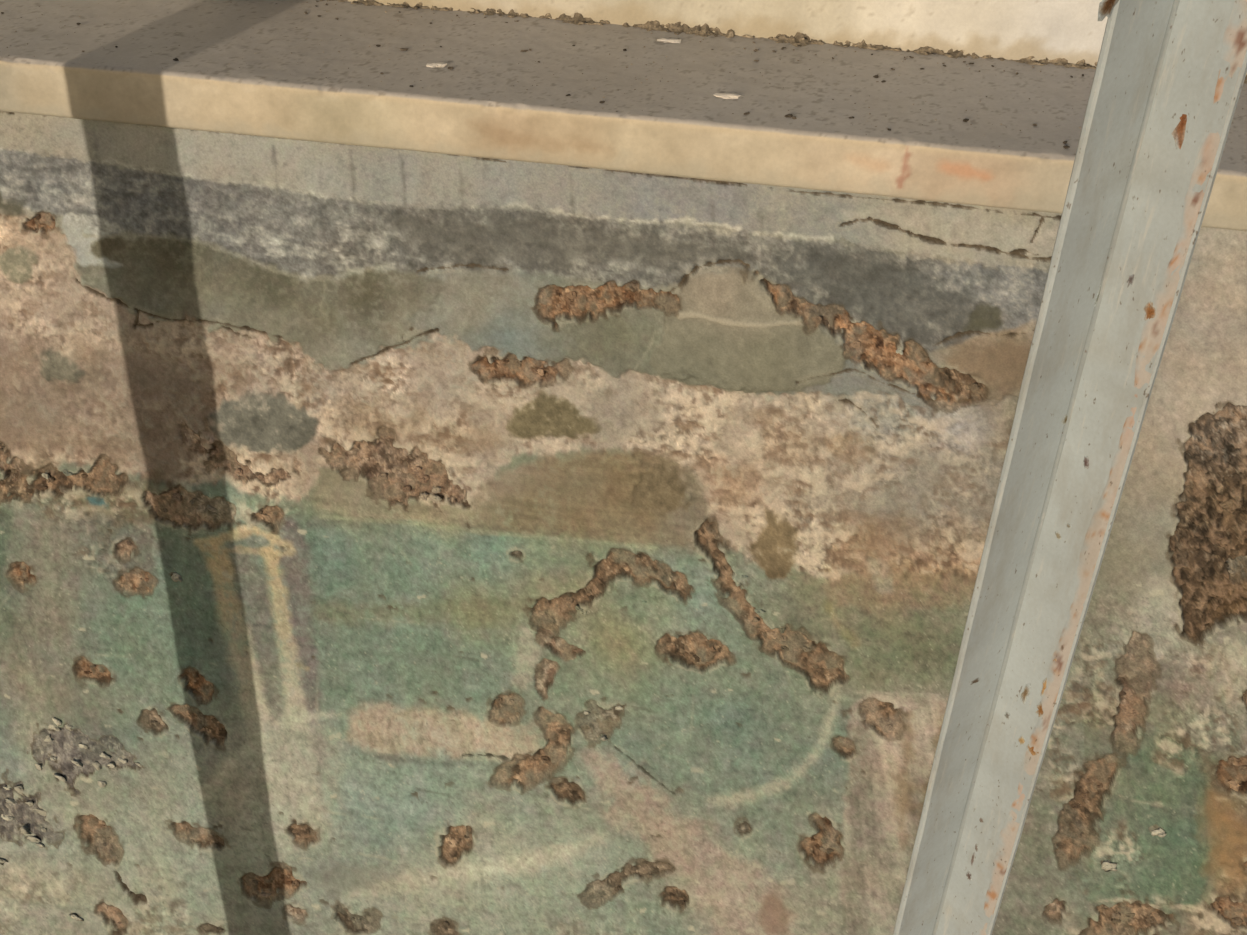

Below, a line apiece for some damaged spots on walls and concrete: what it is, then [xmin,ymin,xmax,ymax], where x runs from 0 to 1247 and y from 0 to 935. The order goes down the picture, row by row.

crack [447,154,507,163]
crack [568,166,1062,263]
spalling [0,206,1019,699]
spalling [1165,399,1247,647]
peeling [27,718,145,797]
spalling [136,664,229,752]
spalling [485,547,696,810]
spalling [857,695,908,744]
peeling [0,769,148,935]
spalling [577,855,697,913]
spalling [1083,893,1181,935]
spalling [1207,892,1247,934]